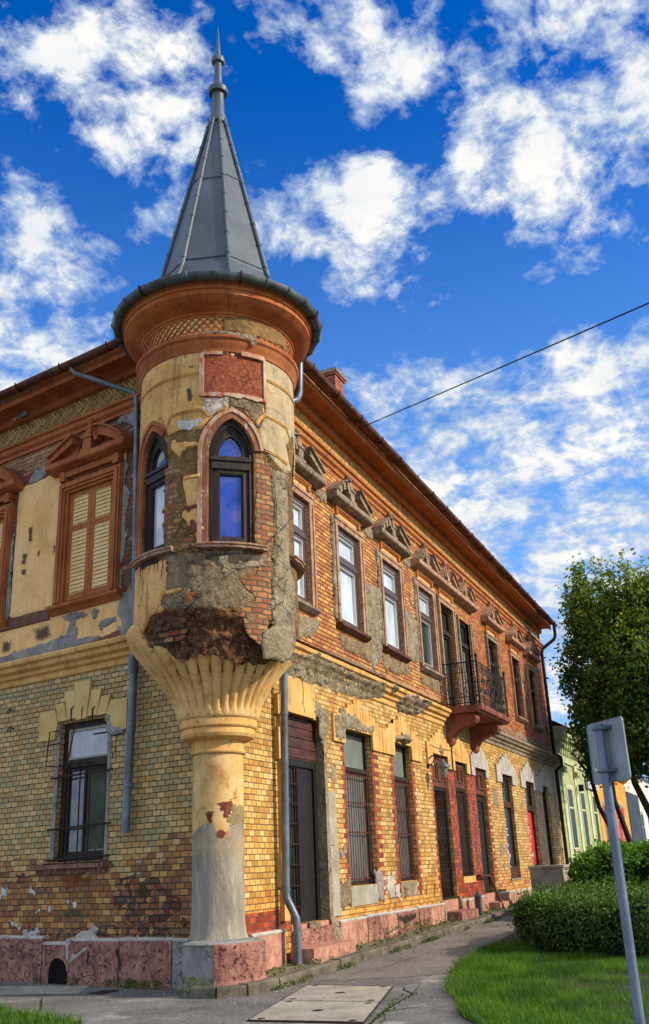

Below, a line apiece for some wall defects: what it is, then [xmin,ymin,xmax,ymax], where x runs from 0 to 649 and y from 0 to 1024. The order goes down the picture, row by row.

spalling [200,317,288,352]
spalling [1,440,63,473]
spalling [60,396,276,665]
spalling [288,641,439,715]
peeling [192,801,244,856]